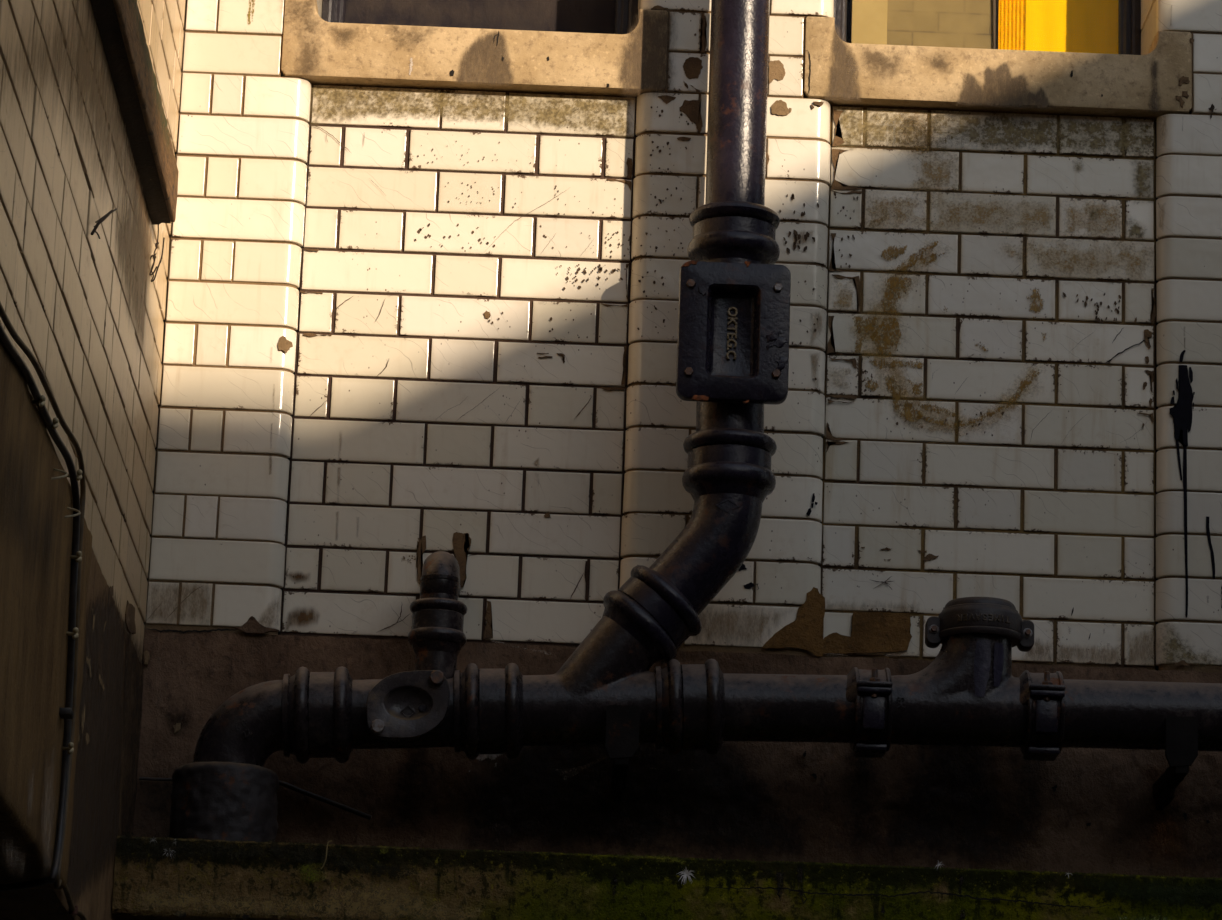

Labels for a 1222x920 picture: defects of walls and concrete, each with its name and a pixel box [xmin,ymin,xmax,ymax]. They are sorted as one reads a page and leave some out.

damp [458,33,512,84]
damp [958,63,1049,108]
damp [871,116,1050,230]
damp [1027,288,1043,319]
damp [834,241,1039,429]
spalling [403,535,426,584]
spalling [453,532,471,588]
spalling [762,587,912,657]
damp [136,884,479,920]